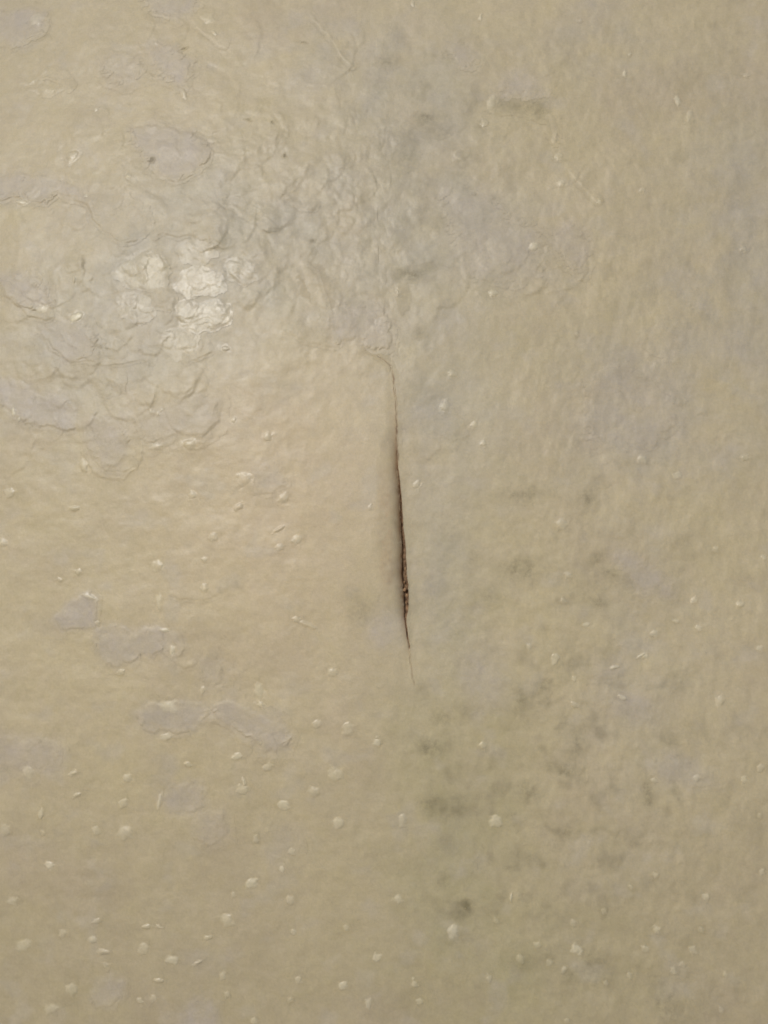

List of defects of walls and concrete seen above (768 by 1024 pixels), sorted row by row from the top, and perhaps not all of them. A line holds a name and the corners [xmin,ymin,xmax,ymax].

peeling [120,117,220,189]
crack [361,346,419,688]